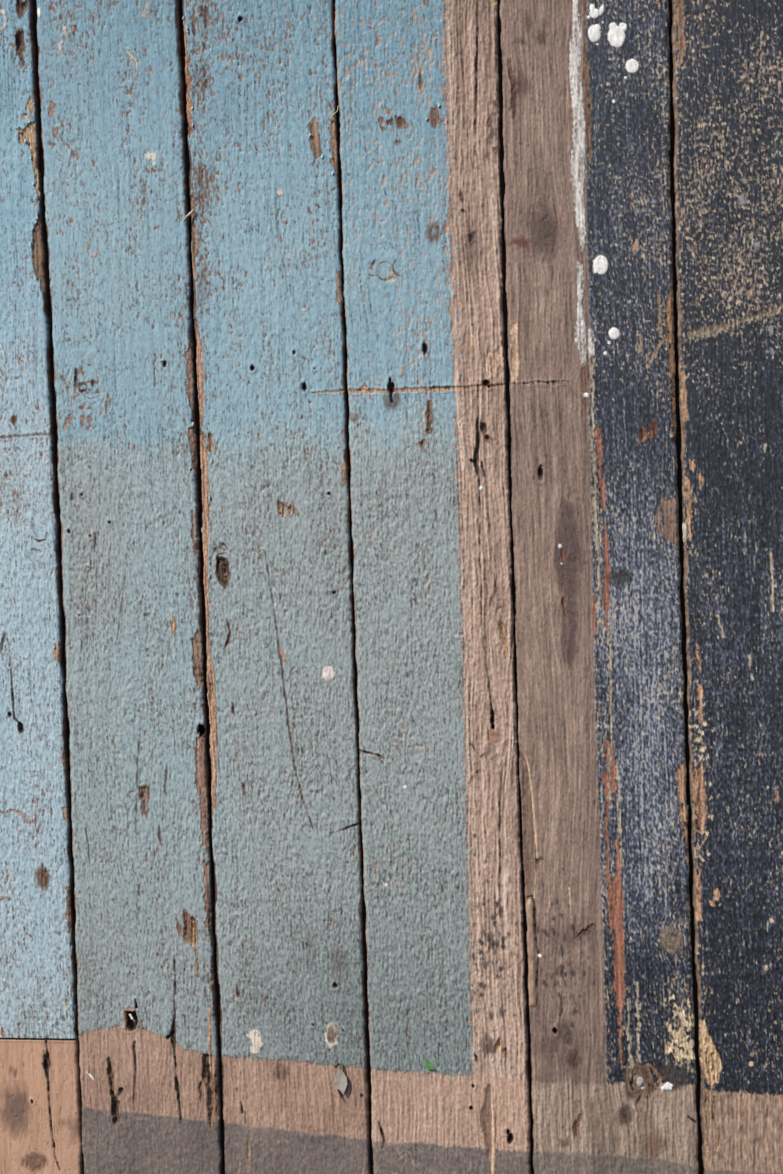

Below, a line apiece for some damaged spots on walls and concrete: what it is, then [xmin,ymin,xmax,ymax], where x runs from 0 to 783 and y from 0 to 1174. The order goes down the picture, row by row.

spalling [0,0,28,66]
peeling [16,97,40,197]
peeling [306,113,338,174]
peeling [29,212,45,296]
peeling [638,284,689,438]
crack [470,394,497,615]
peeling [185,320,230,847]
crack [484,648,494,715]
spalling [139,784,149,816]
spalling [176,861,212,977]
peeling [573,739,662,1099]
peeling [665,994,725,1157]